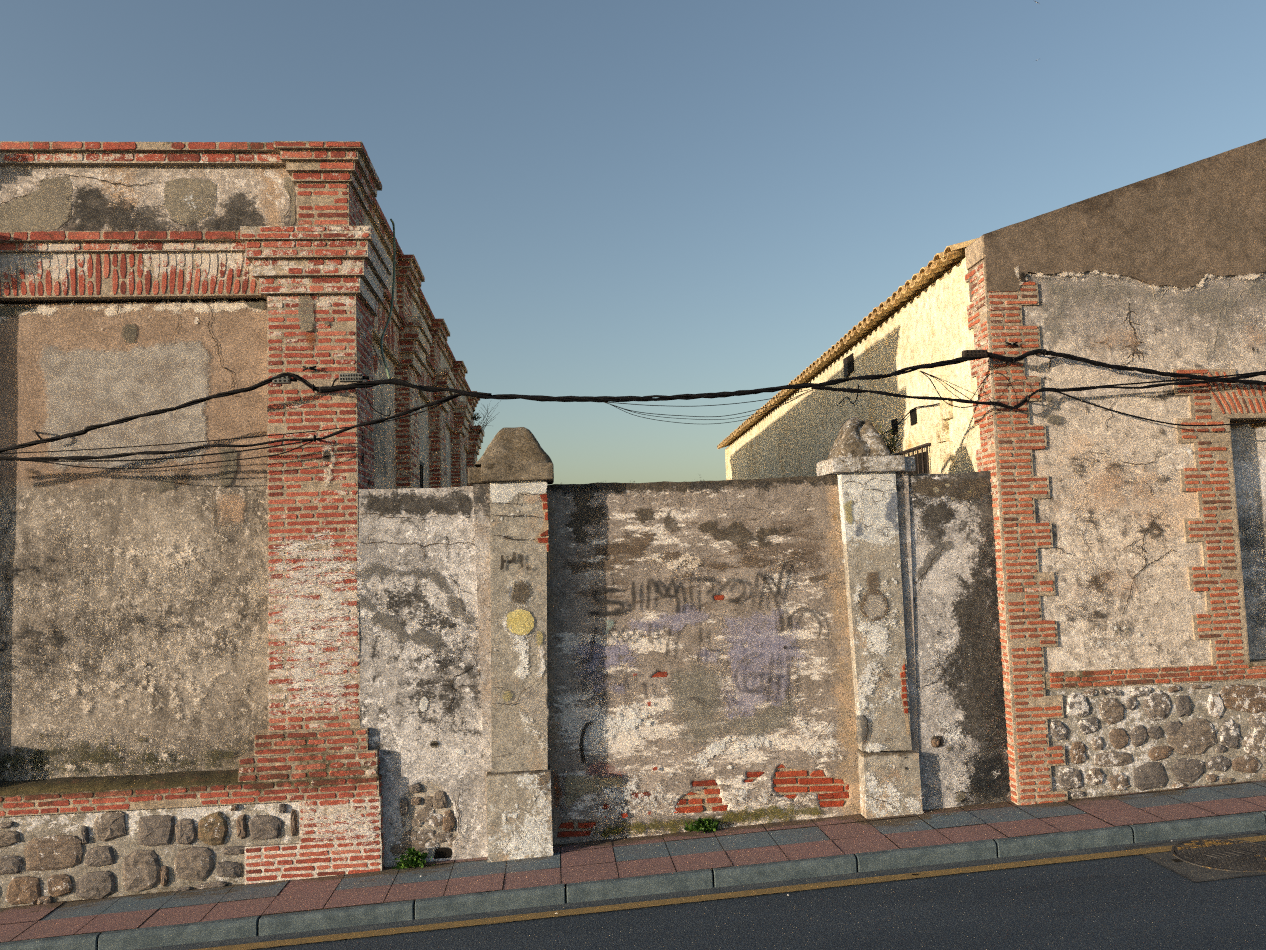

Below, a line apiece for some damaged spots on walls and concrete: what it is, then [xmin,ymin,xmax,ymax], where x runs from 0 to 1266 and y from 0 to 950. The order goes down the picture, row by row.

crack [171,301,238,397]
crack [1067,273,1168,365]
flaking render [1148,273,1260,291]
leakage [549,476,829,580]
crack [1054,398,1177,614]
mould [0,530,267,701]
peeling [29,526,367,731]
mould [372,576,474,731]
mould [910,474,1011,805]
mould [0,730,248,780]
spalling [493,709,849,855]
peeling [863,716,966,815]